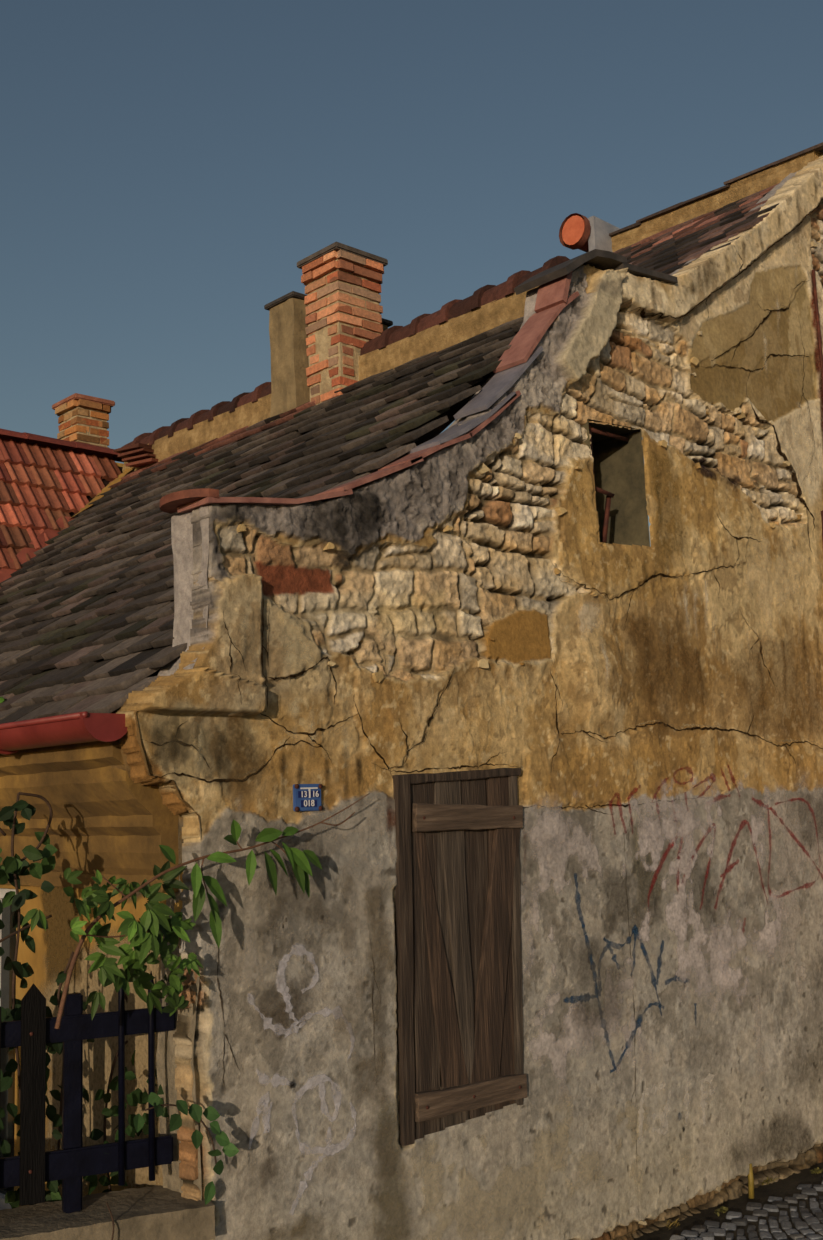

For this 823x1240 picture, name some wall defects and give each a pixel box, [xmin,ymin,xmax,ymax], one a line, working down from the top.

spalling [217,198,823,683]
crack [700,280,816,552]
crack [141,576,517,783]
crack [556,515,777,693]
crack [550,657,823,777]
crack [217,948,239,1083]
crack [368,927,381,1055]
crack [523,797,704,1211]
spalling [569,1141,823,1240]